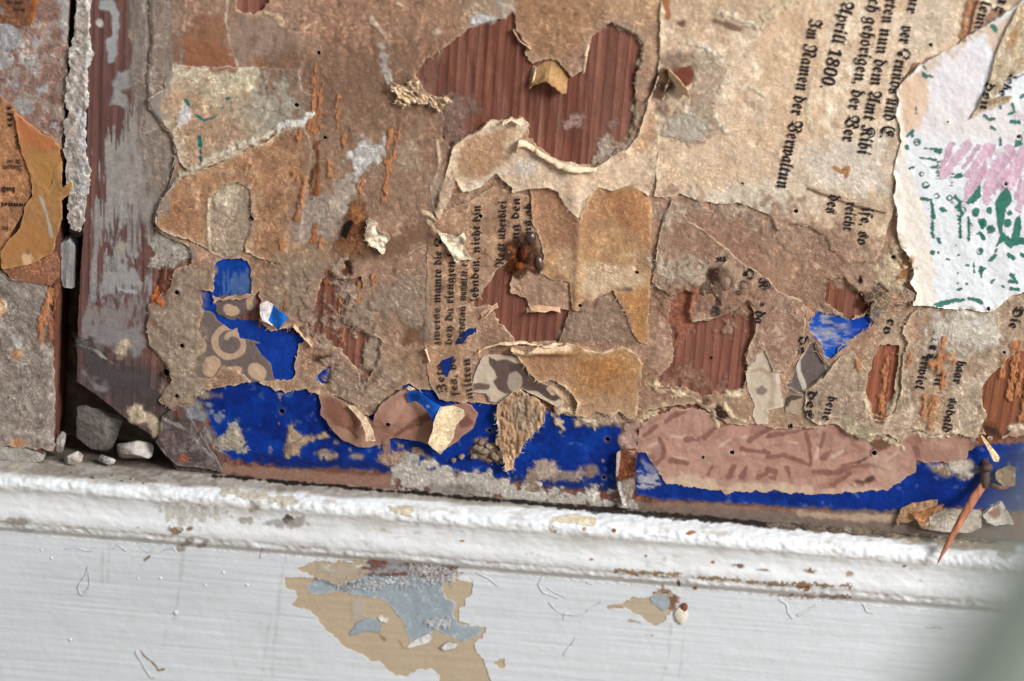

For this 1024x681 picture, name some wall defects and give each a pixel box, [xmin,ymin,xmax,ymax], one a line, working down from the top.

peeling [96,0,119,63]
peeling [561,114,584,130]
peeling [428,92,470,212]
peeling [363,218,390,254]
peeling [260,301,304,334]
peeling [114,339,135,356]
peeling [723,389,746,423]
peeling [912,424,1024,440]
peeling [616,448,637,507]
peeling [221,484,298,524]
peeling [284,559,505,681]
peeling [608,584,680,636]